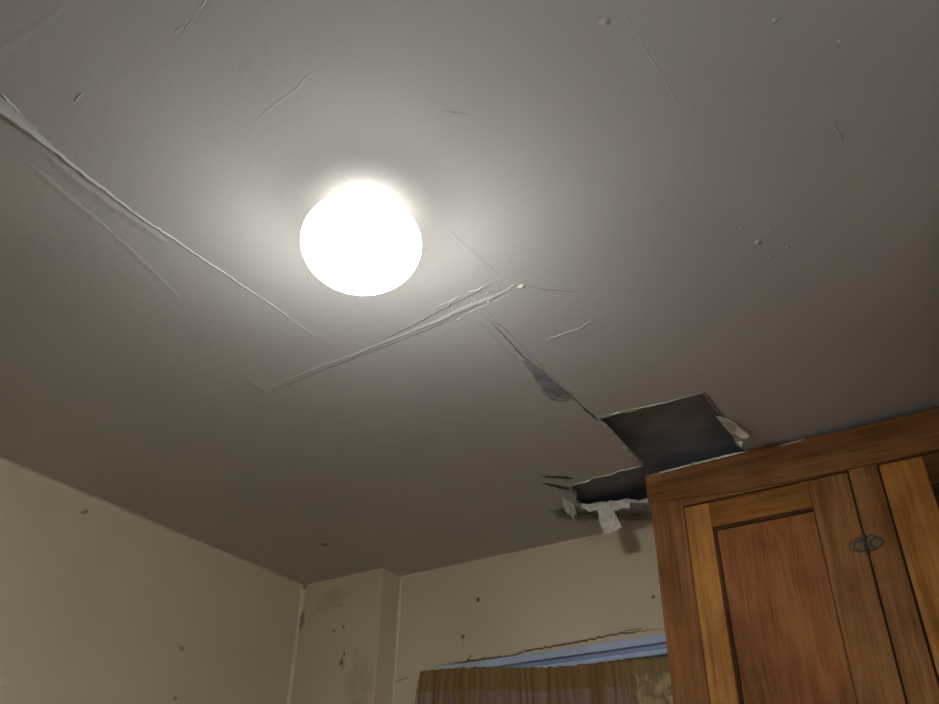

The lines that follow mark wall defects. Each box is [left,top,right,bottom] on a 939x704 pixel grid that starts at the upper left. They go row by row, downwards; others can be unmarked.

crack [0,92,352,380]
crack [547,320,592,340]
spalling [572,393,745,504]